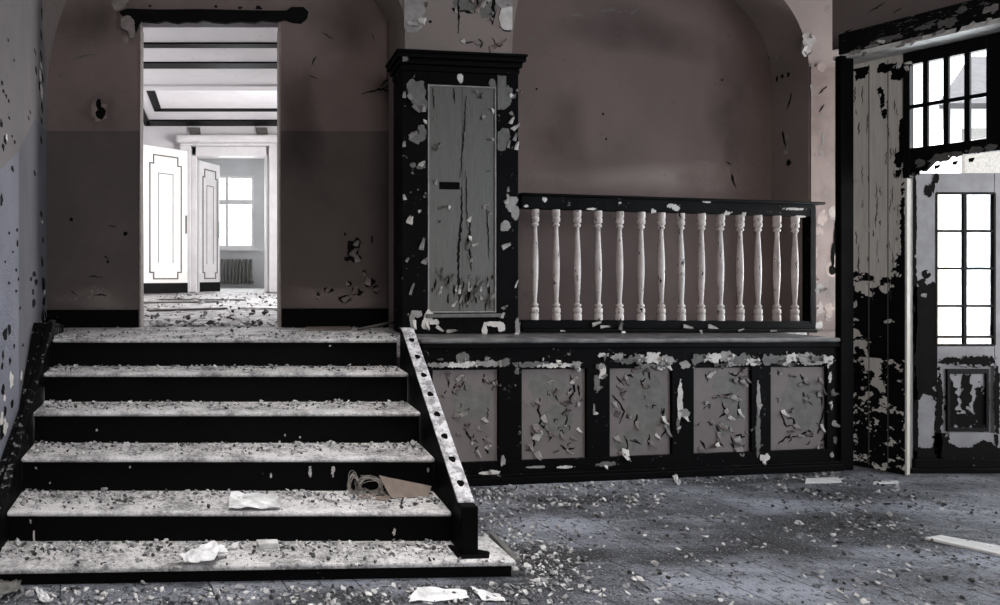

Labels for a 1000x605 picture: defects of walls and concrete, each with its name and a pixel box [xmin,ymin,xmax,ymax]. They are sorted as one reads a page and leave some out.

peeling [452,0,512,52]
peeling [849,4,999,81]
peeling [402,79,441,151]
peeling [475,75,522,151]
crack [432,89,490,311]
peeling [500,187,528,231]
peeling [409,309,458,334]
peeling [419,237,521,334]
peeling [853,118,1000,475]
flaking render [0,324,24,440]
peeling [427,351,840,470]
peeling [478,455,506,475]